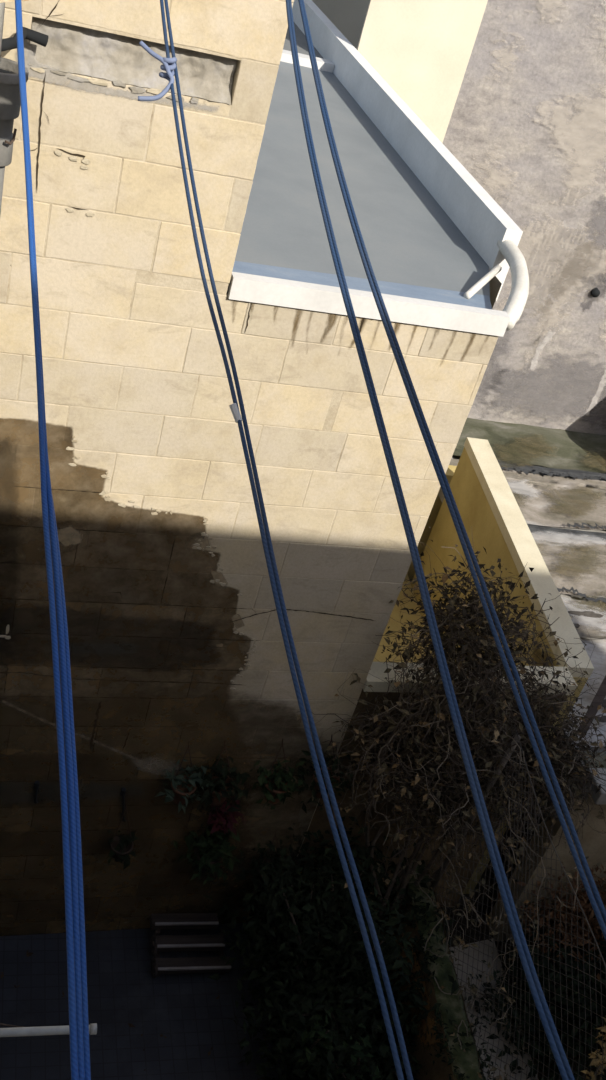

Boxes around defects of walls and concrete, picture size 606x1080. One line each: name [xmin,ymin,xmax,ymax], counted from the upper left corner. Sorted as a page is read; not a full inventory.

damp [0,418,334,936]